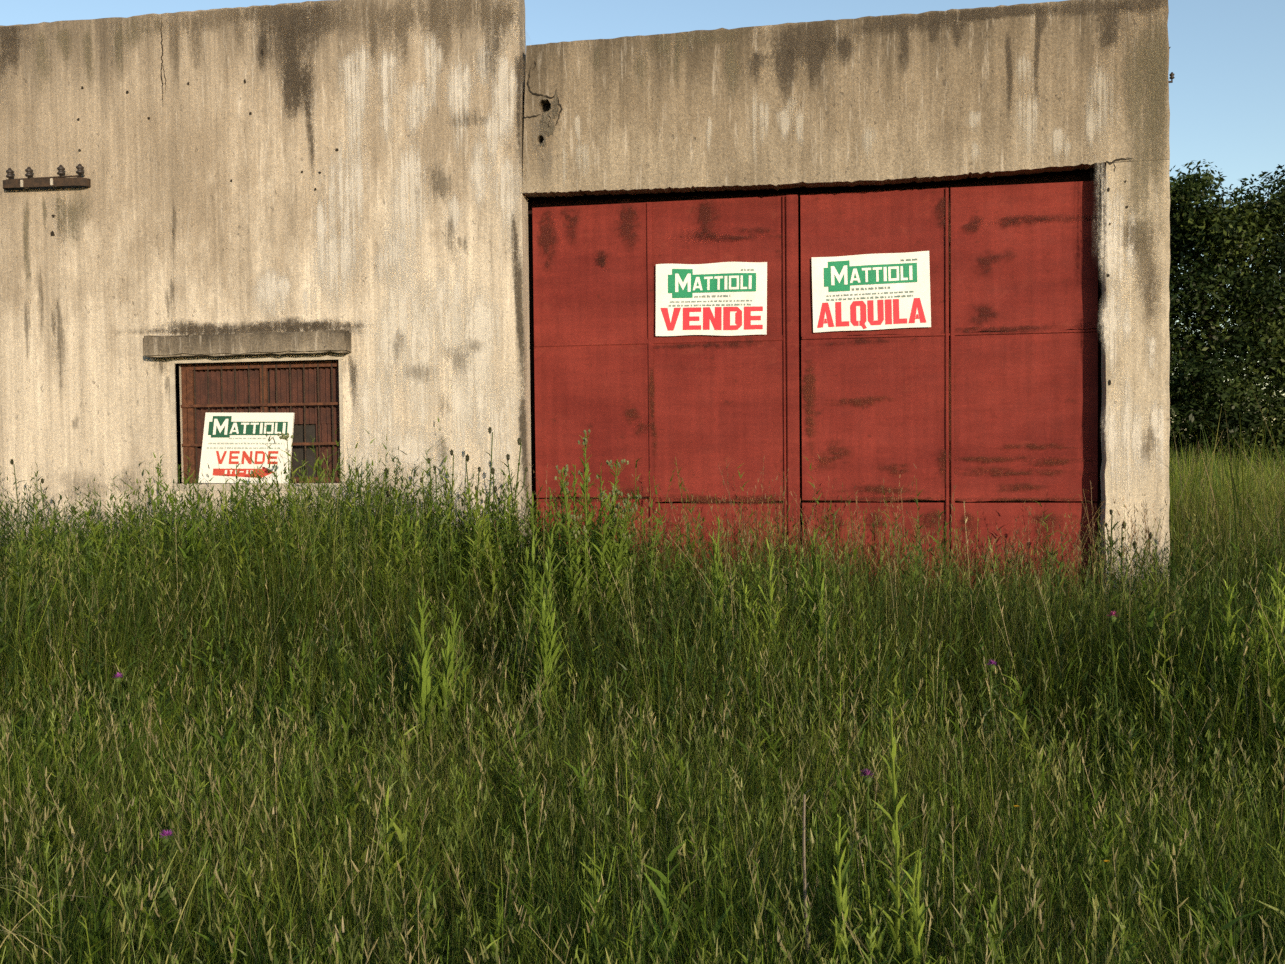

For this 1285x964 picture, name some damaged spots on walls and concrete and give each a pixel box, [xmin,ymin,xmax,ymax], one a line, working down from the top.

damp [0,26,19,70]
damp [726,25,852,153]
damp [900,29,909,67]
damp [1006,0,1161,149]
damp [162,0,525,374]
damp [563,116,589,181]
damp [1053,128,1069,154]
damp [23,200,83,268]
damp [1124,224,1156,311]
damp [519,399,528,496]